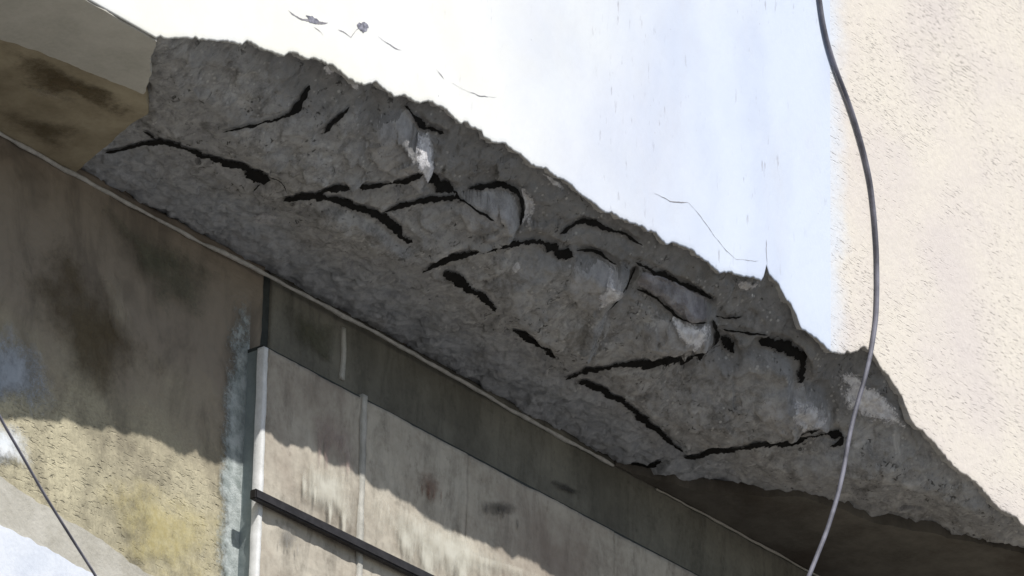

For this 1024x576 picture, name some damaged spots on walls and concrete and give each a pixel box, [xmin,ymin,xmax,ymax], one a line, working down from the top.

water stain [33,61,117,109]
crack [225,85,311,132]
water stain [0,338,44,404]
spalling [81,37,868,501]
crack [106,131,844,475]
spalling [839,360,1024,548]